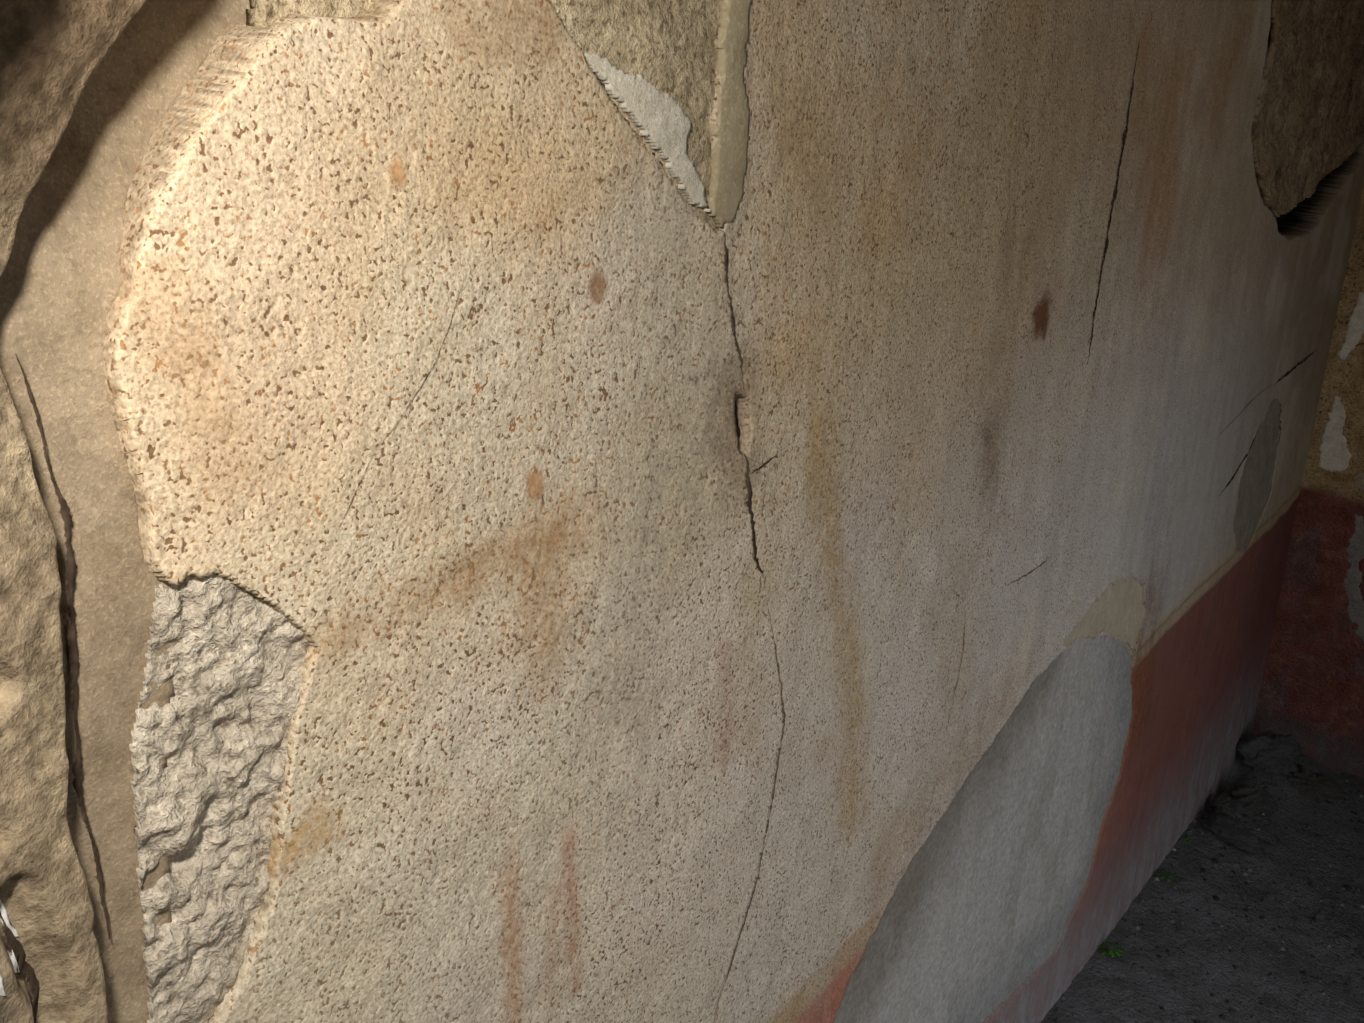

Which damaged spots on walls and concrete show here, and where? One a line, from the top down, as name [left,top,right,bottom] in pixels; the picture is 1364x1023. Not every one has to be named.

crack [15,354,110,940]
flaking render [0,0,375,1023]
crack [593,72,663,166]
spalling [550,0,723,232]
crack [715,227,744,389]
crack [715,455,786,1012]
spalling [832,636,1132,1023]
rust [1034,298,1049,338]
crack [1087,39,1140,364]
peeling [1233,398,1280,551]